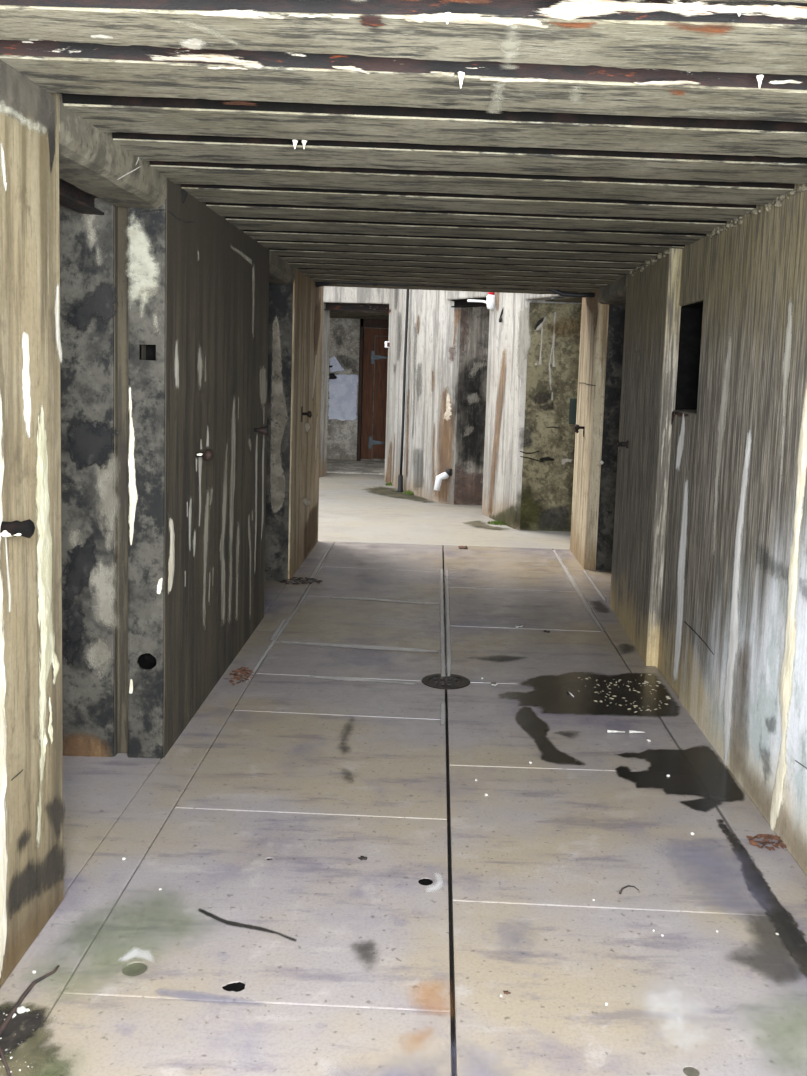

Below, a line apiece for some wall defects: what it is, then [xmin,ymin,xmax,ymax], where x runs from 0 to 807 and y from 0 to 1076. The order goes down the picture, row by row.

corrosion [359,15,387,28]
corrosion [668,23,733,34]
water stain [87,214,95,242]
water stain [55,282,116,362]
water stain [780,302,792,476]
water stain [770,387,807,831]
water stain [0,332,138,977]
water stain [681,799,722,812]